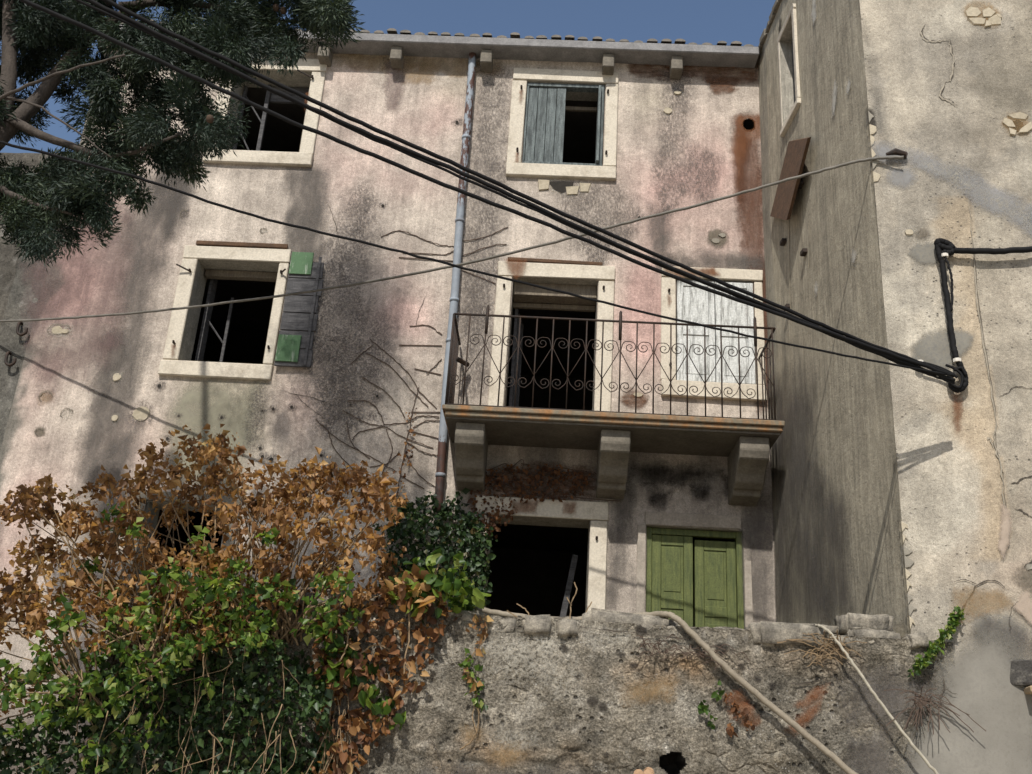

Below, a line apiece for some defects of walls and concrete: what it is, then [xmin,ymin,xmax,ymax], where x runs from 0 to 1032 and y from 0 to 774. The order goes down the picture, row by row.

spalling [965,6,1002,28]
crack [920,25,955,106]
spalling [1002,112,1032,136]
spalling [538,179,591,196]
corrosion [732,115,769,405]
crack [968,197,1032,517]
crack [954,535,1017,631]
peeling [1014,560,1032,624]
spalling [659,751,687,774]